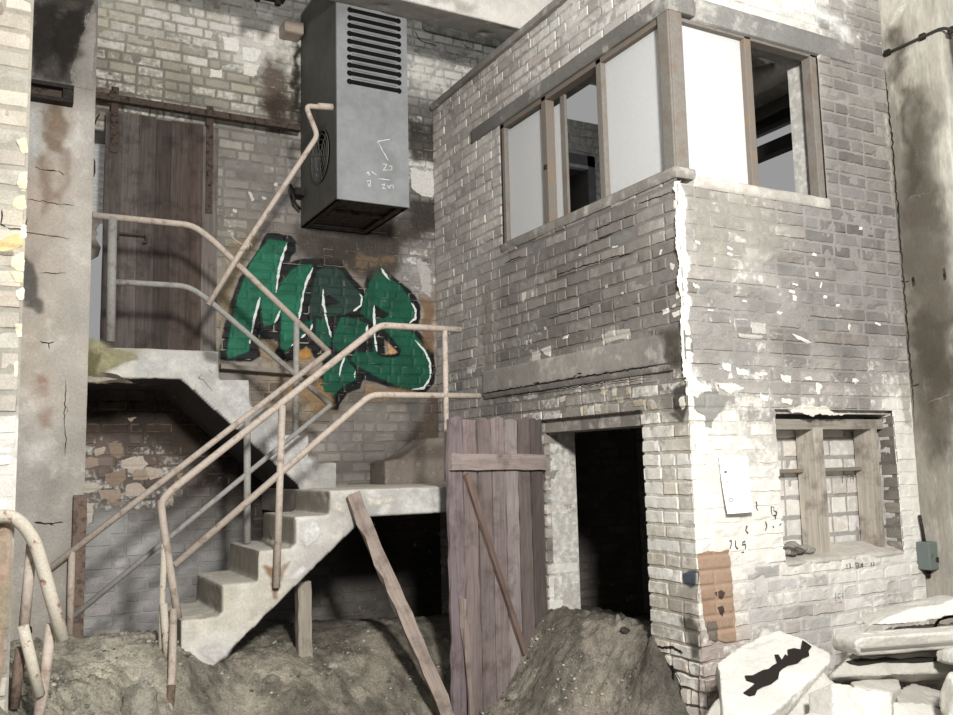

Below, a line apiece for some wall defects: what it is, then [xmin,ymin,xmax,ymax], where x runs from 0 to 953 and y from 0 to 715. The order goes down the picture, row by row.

peeling [16,137,28,154]
peeling [12,171,28,210]
peeling [0,224,27,300]
leakage [23,258,43,313]
peeling [662,181,769,410]
leakage [902,100,953,451]
peeling [782,376,846,417]
peeling [900,379,911,425]
flaking render [84,443,163,526]